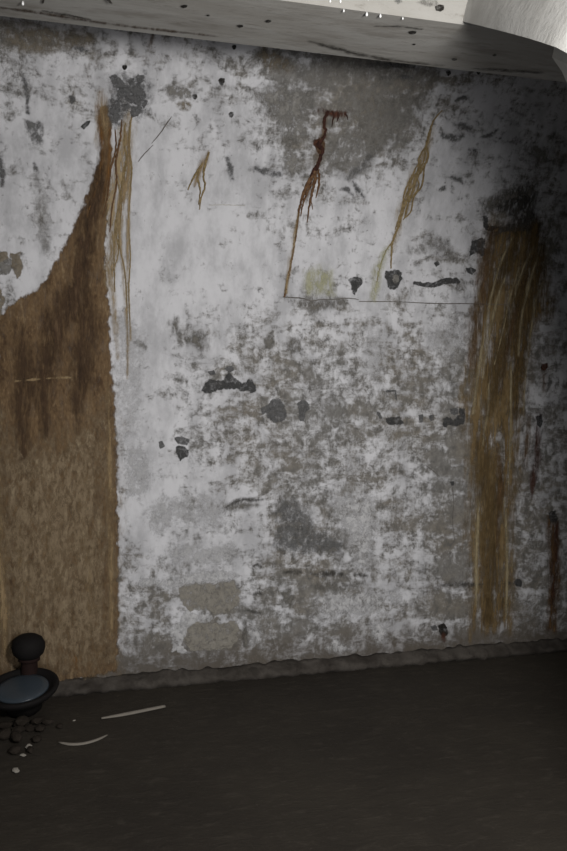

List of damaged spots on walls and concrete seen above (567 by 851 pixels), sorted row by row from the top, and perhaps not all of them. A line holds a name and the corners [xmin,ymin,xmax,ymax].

spalling [108,65,150,125]
corrosion [284,109,352,297]
leakage [482,182,541,240]
leakage [173,320,204,349]
spalling [202,366,256,393]